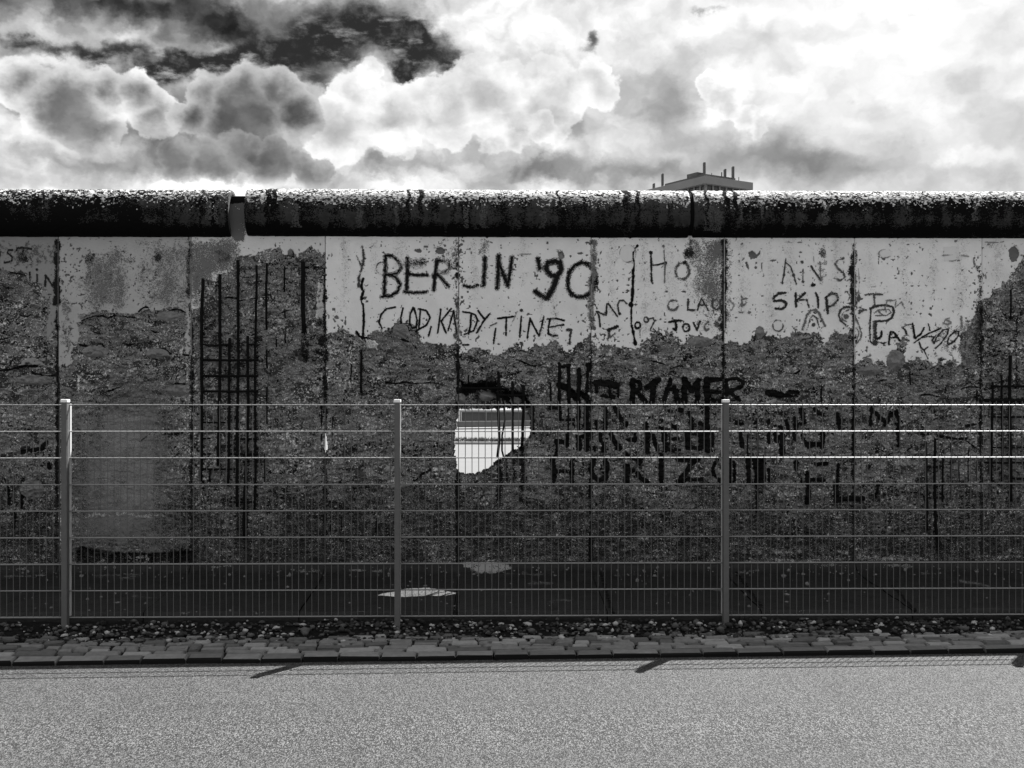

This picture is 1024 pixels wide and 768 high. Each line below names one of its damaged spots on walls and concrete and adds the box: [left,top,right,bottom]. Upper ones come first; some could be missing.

spalling [0,238,1024,566]